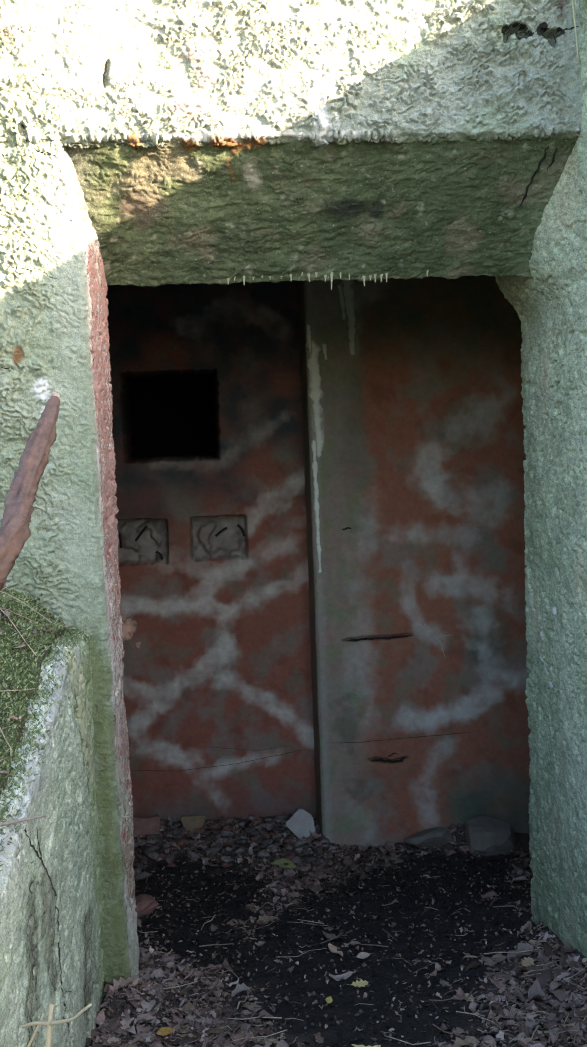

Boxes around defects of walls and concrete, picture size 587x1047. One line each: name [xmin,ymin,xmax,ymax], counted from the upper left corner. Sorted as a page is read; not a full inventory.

spalling [501,22,578,45]
water stain [311,37,339,145]
rust [211,137,266,181]
crack [520,145,558,206]
water stain [337,280,356,355]
water stain [306,324,327,573]
peeling [87,240,141,795]
crack [346,634,413,642]
crack [344,731,479,763]
crack [24,828,72,1032]